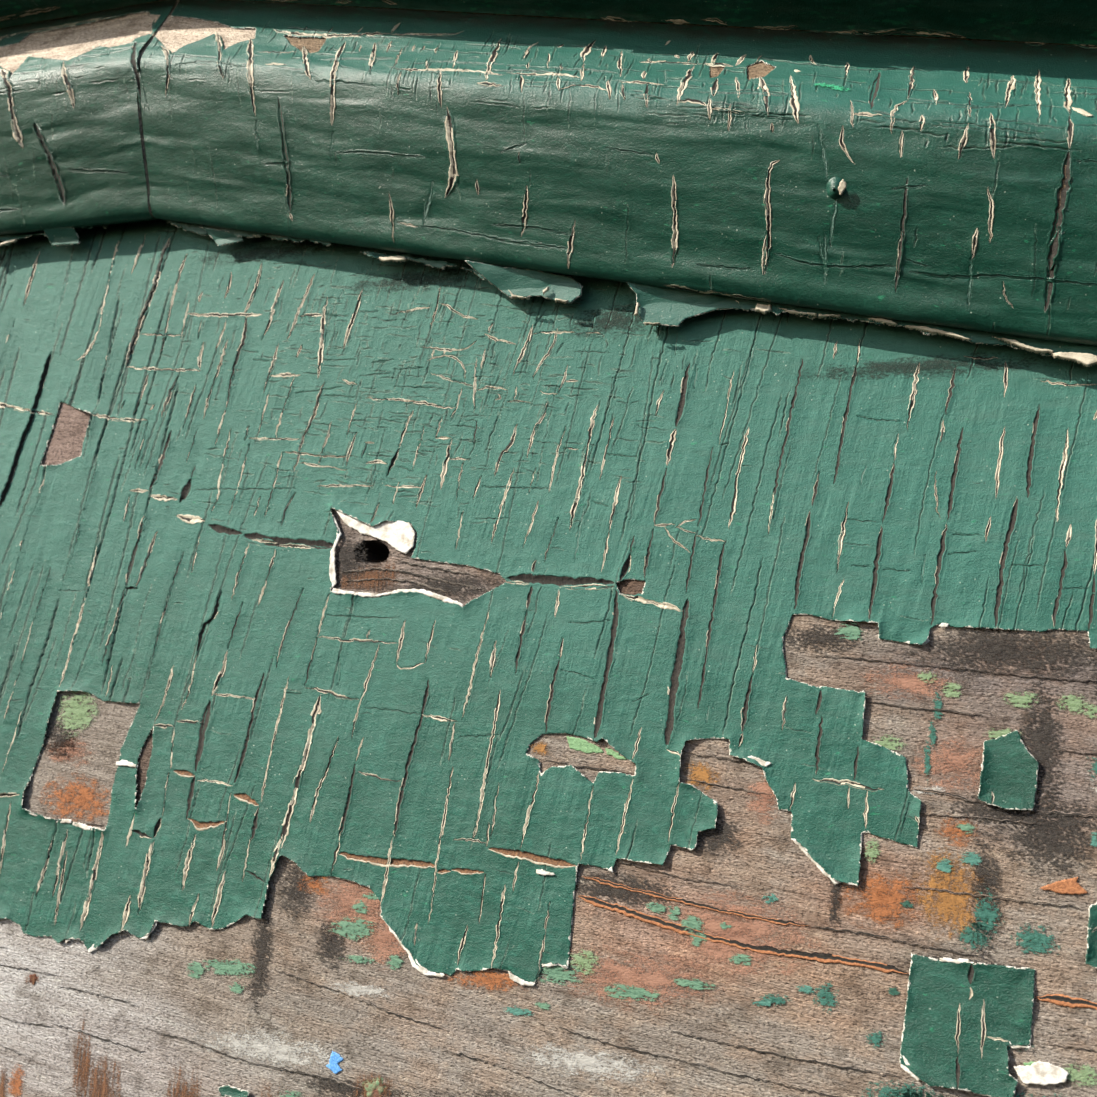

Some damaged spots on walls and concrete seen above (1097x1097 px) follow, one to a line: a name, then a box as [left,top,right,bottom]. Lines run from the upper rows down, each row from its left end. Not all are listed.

peeling [0,12,256,79]
crack [0,206,19,214]
crack [0,62,129,206]
crack [107,22,1097,314]
peeling [40,402,90,465]
crack [768,357,804,534]
crack [793,340,1097,632]
peeling [329,508,506,607]
peeling [0,615,1097,1097]
crack [780,697,788,730]
crack [789,690,884,828]
crack [900,803,920,833]